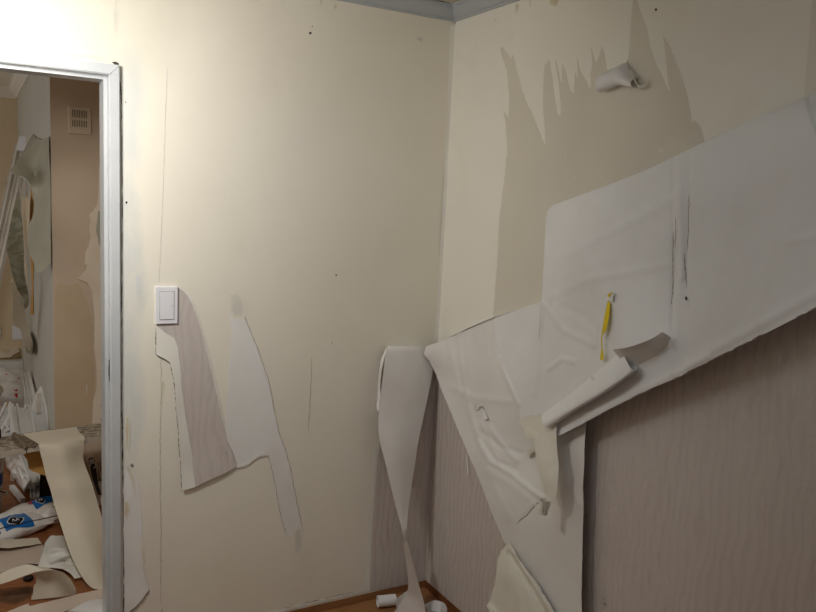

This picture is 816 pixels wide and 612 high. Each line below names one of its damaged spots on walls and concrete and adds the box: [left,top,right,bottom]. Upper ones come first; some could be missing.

peeling [493,0,705,317]
flaking render [54,165,101,429]
peeling [155,287,304,558]